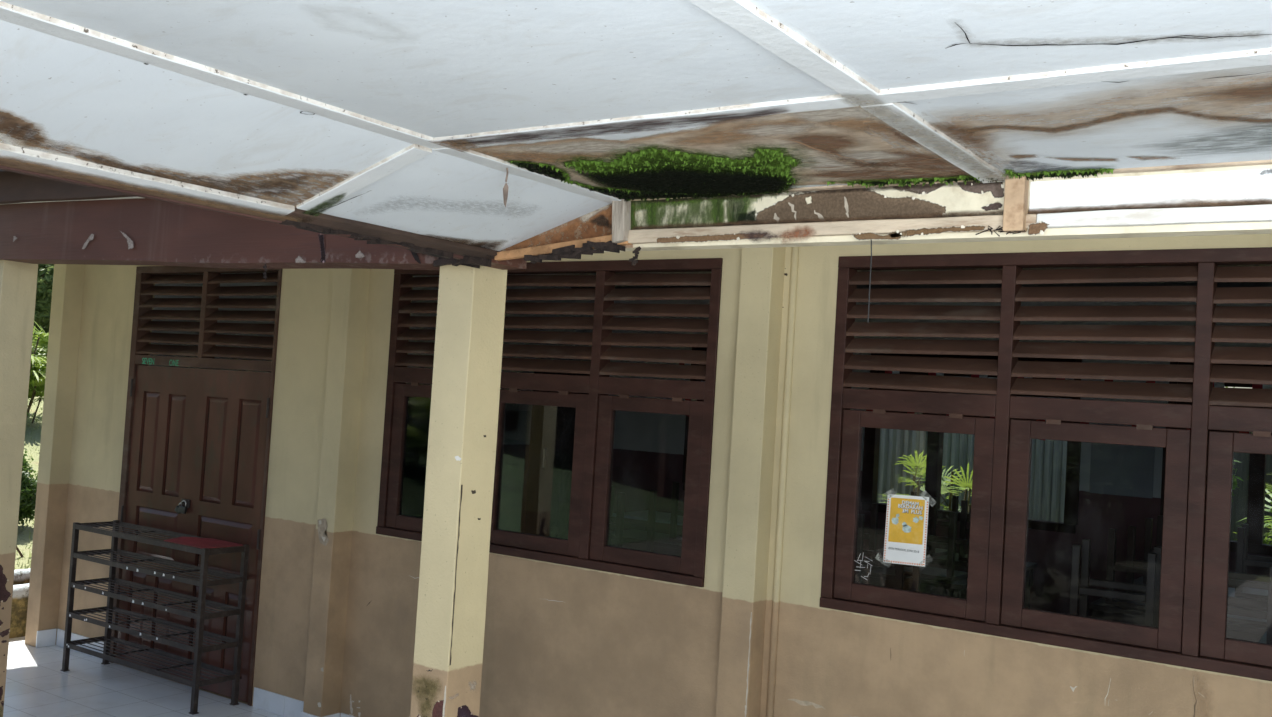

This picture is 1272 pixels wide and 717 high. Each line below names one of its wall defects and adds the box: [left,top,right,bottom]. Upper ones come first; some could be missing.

crack [947,26,1272,48]
leakage [434,77,1272,202]
leakage [0,111,349,222]
leakage [632,211,1003,241]
peeling [656,183,985,243]
peeling [957,182,1004,211]
leakage [1028,200,1272,214]
leakage [424,235,502,250]
peeling [0,565,11,656]
peeling [417,686,479,717]